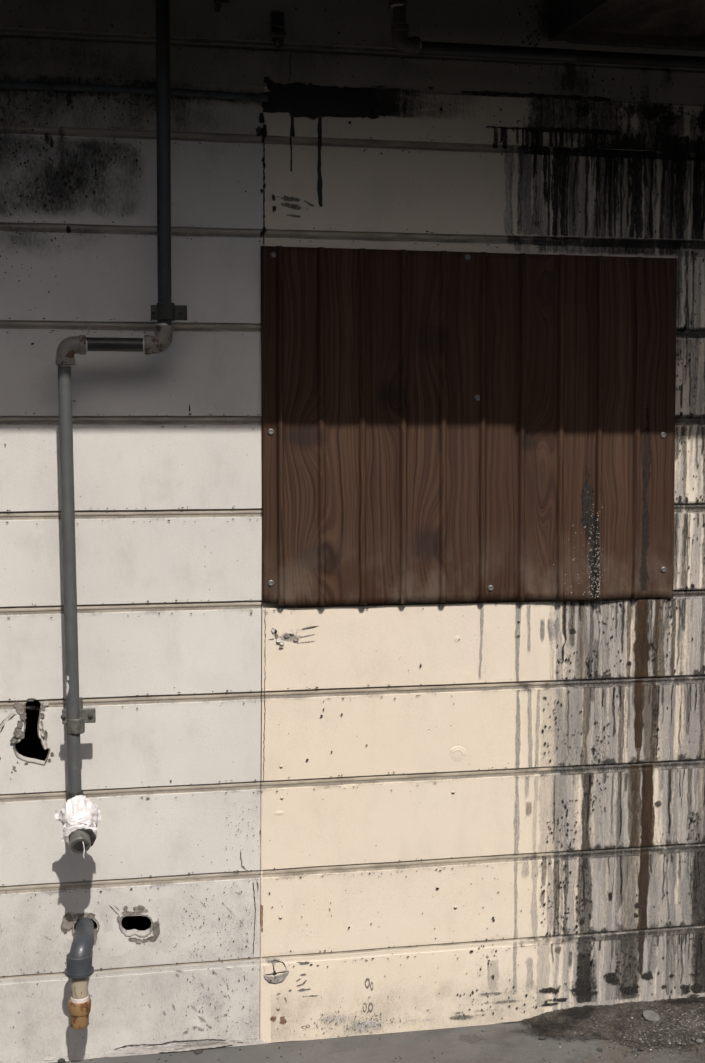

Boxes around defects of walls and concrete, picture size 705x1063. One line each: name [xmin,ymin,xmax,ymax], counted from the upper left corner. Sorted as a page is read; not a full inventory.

mould [0,42,156,282]
water stain [443,63,705,1023]
hole [0,698,54,774]
hole [61,912,100,945]
hole [109,905,160,943]
water stain [289,982,440,1037]